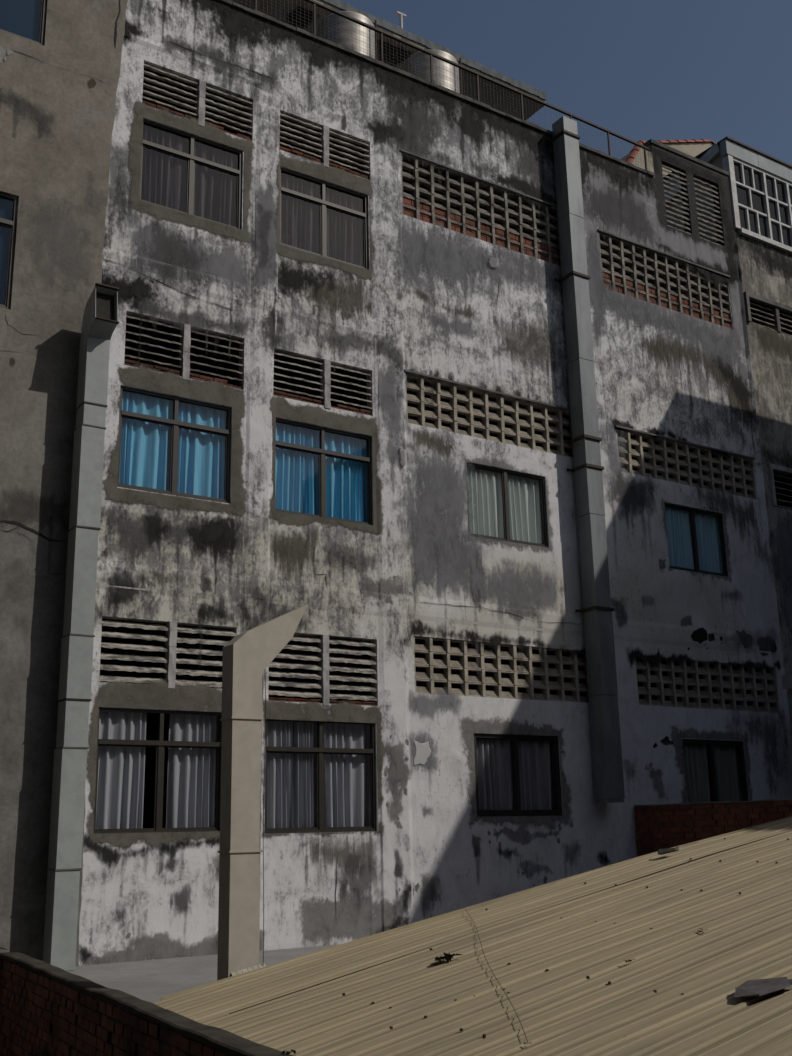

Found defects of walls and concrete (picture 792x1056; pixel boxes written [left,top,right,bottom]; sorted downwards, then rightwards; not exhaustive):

damp [123,19,144,44]
damp [162,0,557,207]
damp [101,149,562,616]
damp [602,419,653,523]
crack [0,520,66,542]
damp [198,588,307,631]
damp [84,835,220,871]
damp [310,837,376,902]
damp [175,887,190,912]
damp [382,851,437,932]
damp [80,948,93,963]